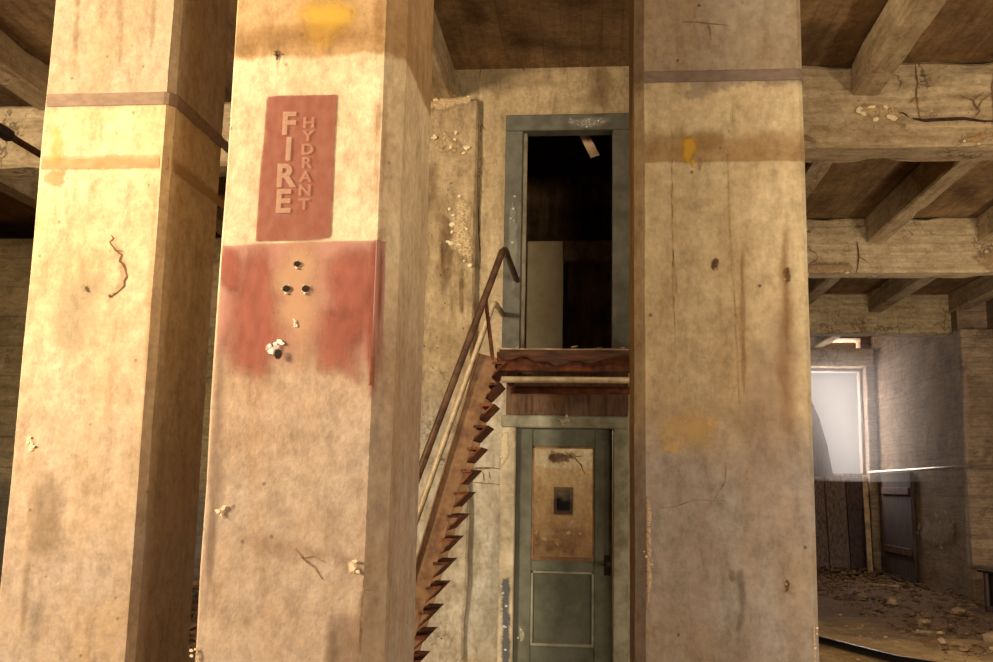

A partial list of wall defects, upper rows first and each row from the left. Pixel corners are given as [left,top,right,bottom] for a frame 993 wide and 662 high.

spalling [856,105,902,122]
crack [899,64,993,126]
crack [109,235,128,297]
peeling [216,241,386,385]